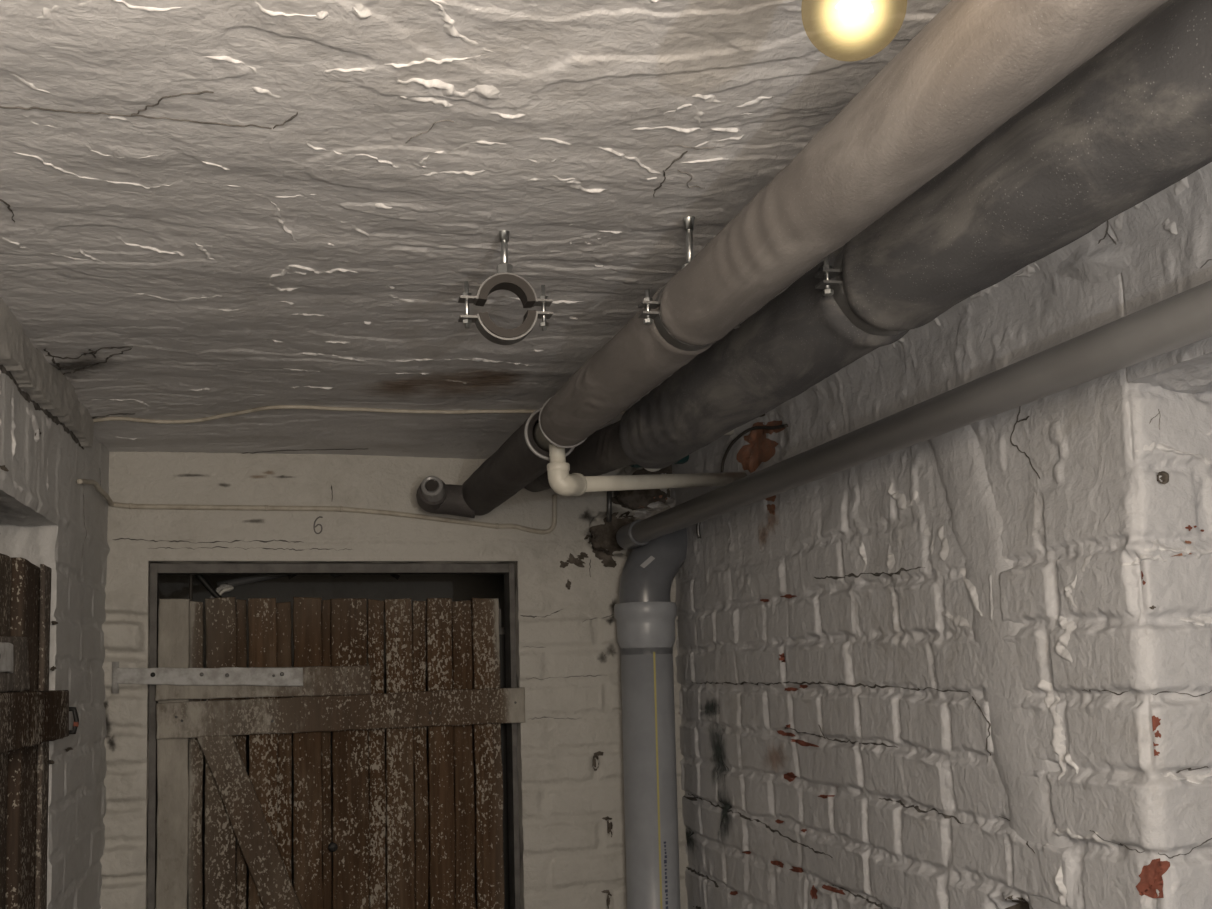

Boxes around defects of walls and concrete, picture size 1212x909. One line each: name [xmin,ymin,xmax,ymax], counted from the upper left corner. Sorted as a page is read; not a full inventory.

crack [0,91,298,129]
crack [36,347,132,375]
leakage [284,341,544,390]
crack [0,365,135,450]
spalling [560,465,672,590]
crack [814,567,926,580]
leakage [712,729,726,776]
crack [692,681,991,756]
spalling [1152,716,1161,756]
leakage [719,797,732,833]
crack [683,793,883,909]
spalling [1136,858,1170,898]